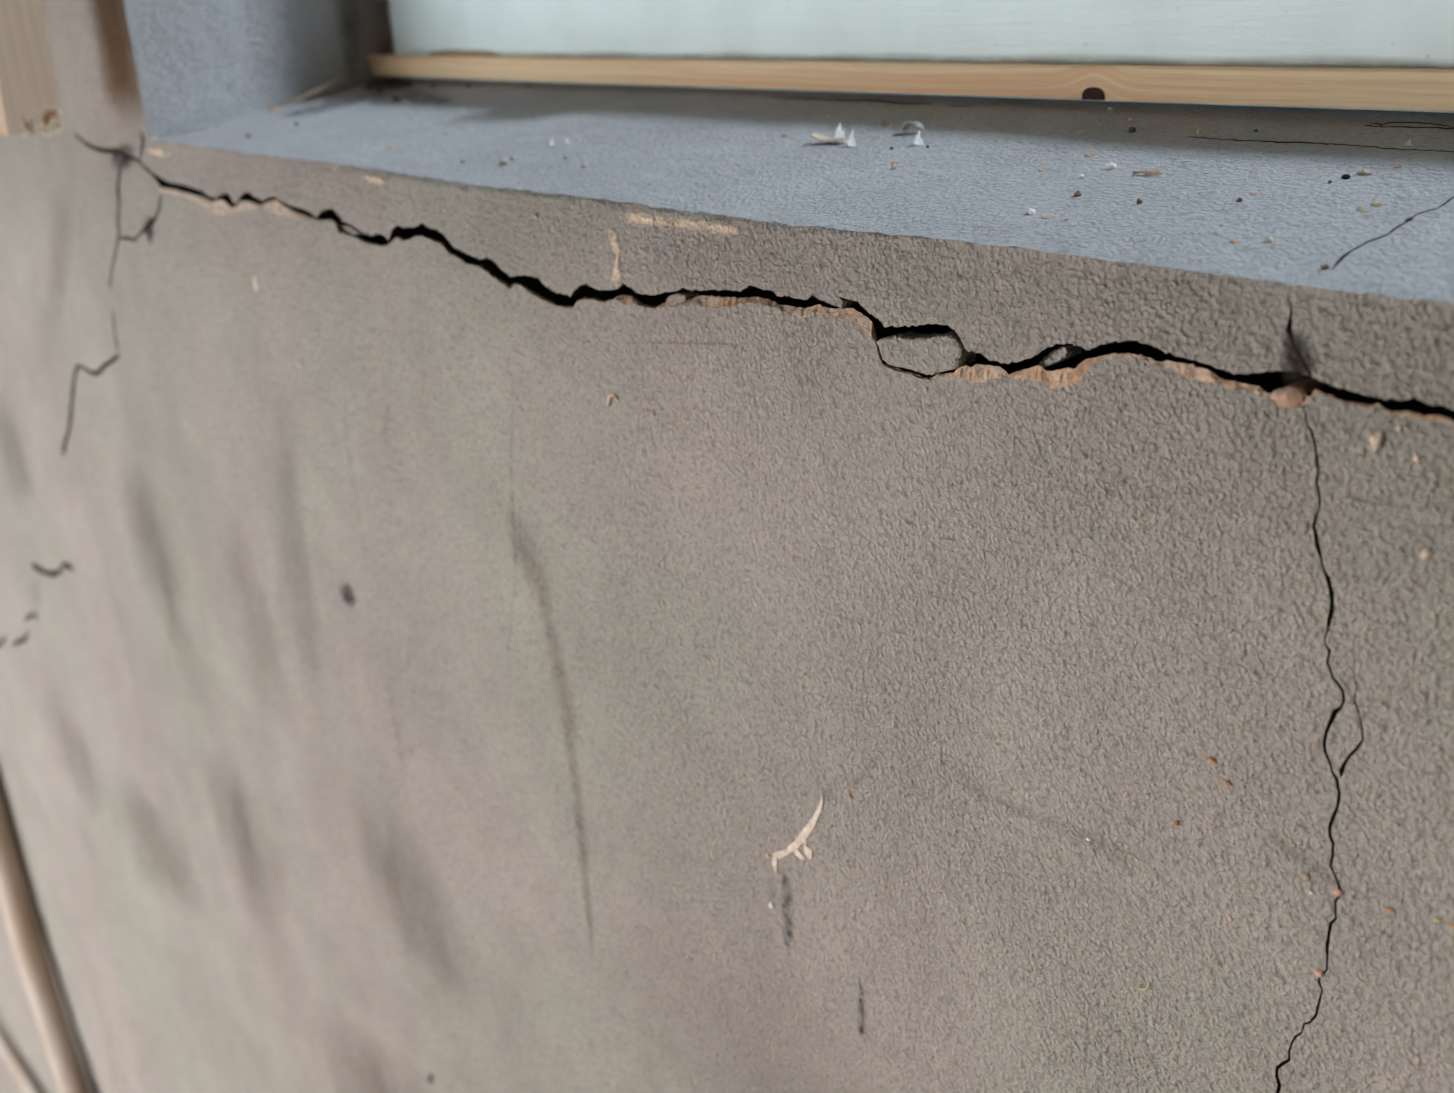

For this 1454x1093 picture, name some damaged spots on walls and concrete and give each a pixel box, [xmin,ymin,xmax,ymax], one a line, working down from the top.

crack [1193,122,1454,152]
crack [62,310,120,456]
crack [0,612,39,646]
crack [31,562,74,577]
crack [74,133,1454,890]
crack [41,912,100,1093]
crack [1275,896,1340,1093]